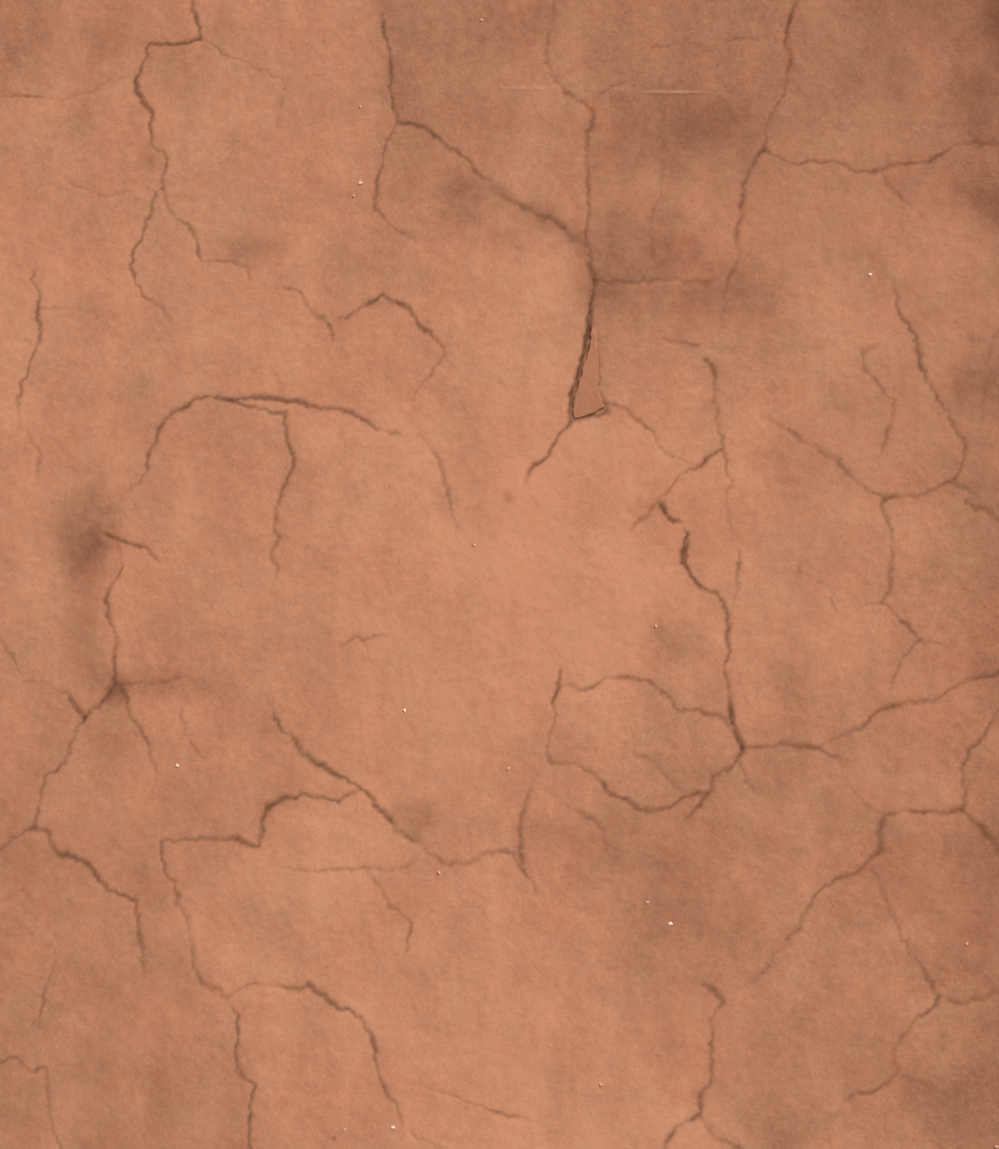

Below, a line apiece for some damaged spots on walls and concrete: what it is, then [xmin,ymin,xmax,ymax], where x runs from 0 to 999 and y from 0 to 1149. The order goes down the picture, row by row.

crack [571,303,604,419]